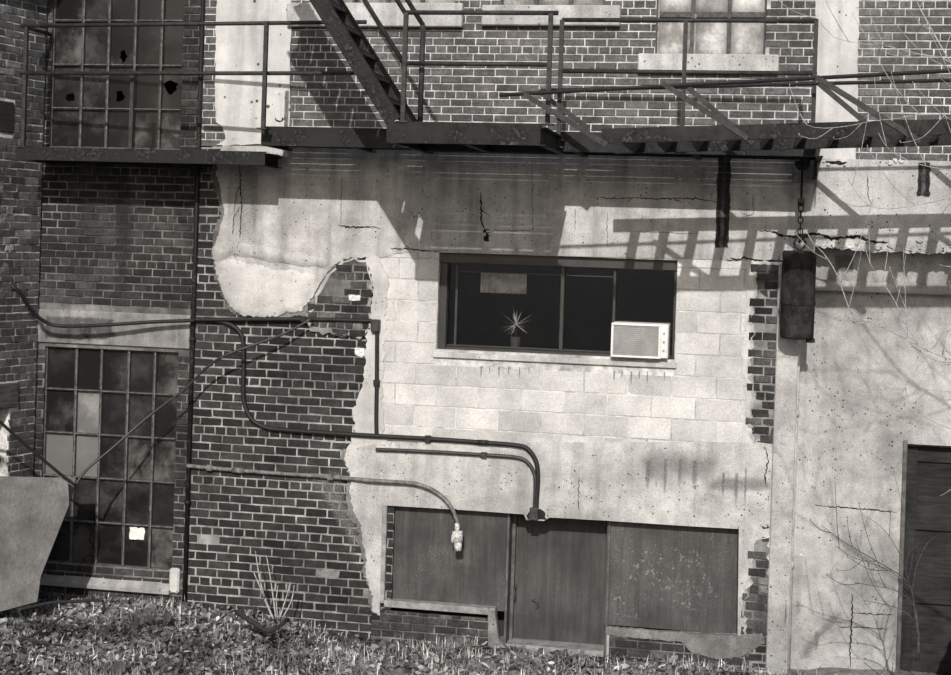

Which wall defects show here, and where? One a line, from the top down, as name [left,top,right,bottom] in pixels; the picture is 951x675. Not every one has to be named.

crack [728,255,782,263]
crack [759,230,886,244]
spalling [815,238,951,254]
peeling [746,261,779,444]
flaking render [340,449,373,611]
peeling [739,524,770,671]
crack [842,593,892,667]